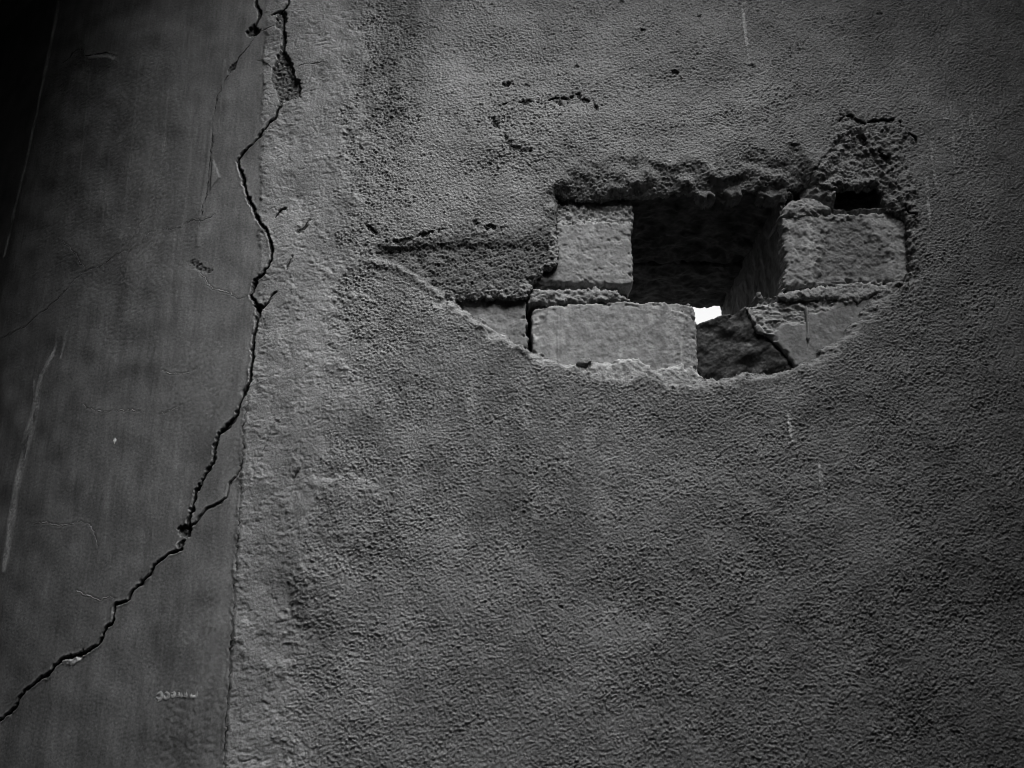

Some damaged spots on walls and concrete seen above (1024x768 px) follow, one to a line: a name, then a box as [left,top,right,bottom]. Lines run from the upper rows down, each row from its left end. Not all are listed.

crack [0,106,282,767]
crack [0,0,321,339]
spalling [377,144,922,391]